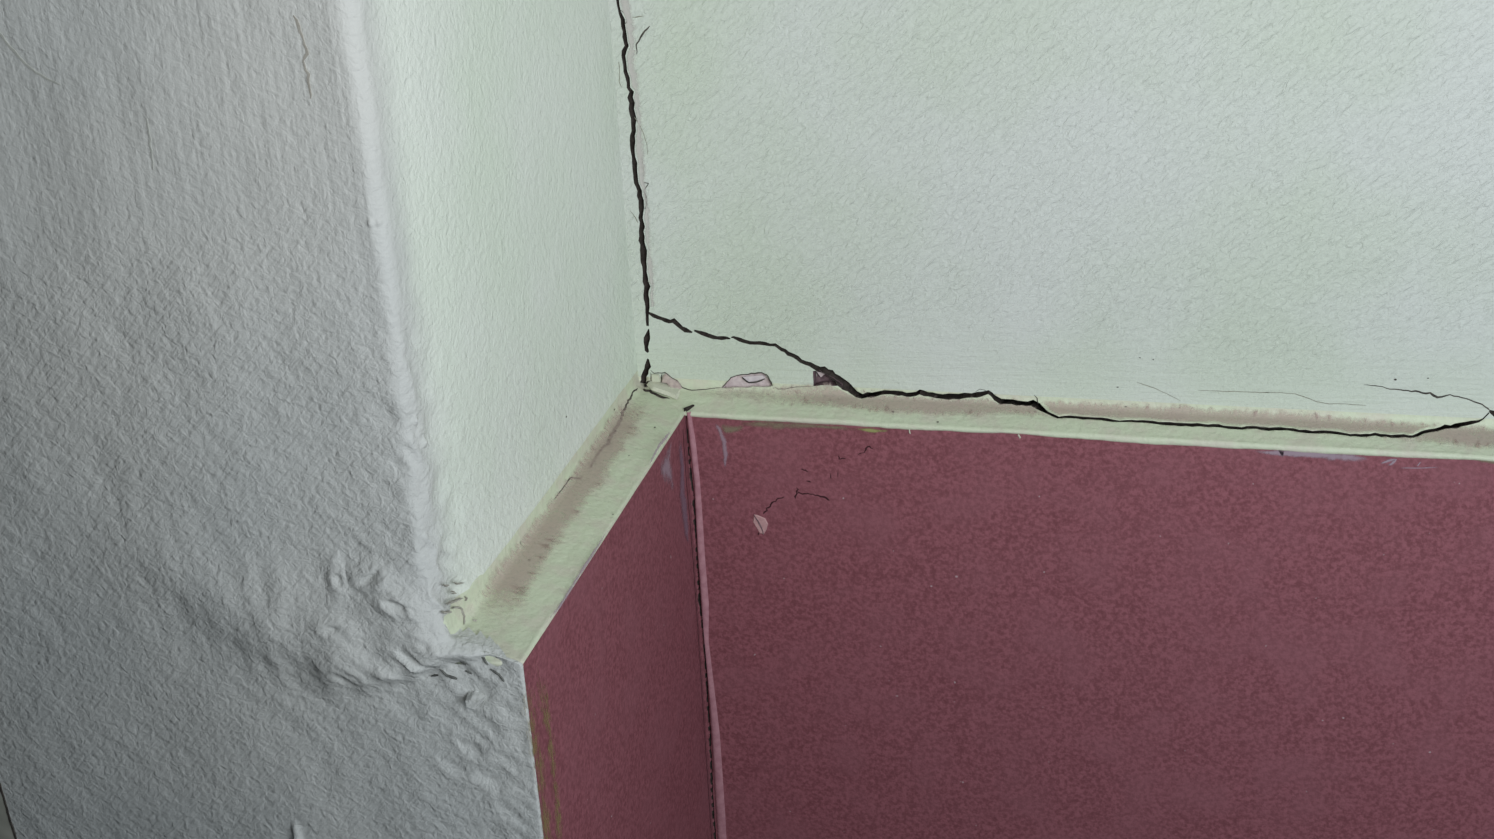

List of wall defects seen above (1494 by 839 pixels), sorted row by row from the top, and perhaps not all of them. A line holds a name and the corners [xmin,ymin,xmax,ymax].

crack [683,405,716,839]
flaking render [643,370,843,400]
crack [758,446,873,535]
crack [555,0,1494,498]